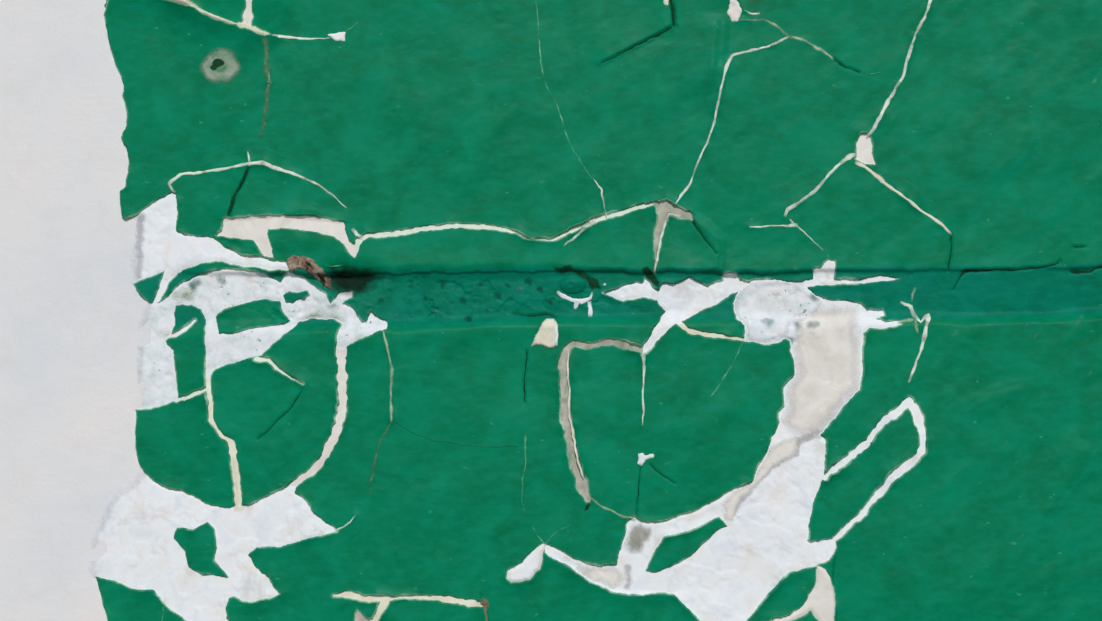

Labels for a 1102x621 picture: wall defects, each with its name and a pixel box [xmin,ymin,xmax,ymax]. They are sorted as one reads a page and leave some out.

peeling [169,0,356,41]
crack [167,0,1102,288]
peeling [132,193,398,439]
peeling [507,201,901,621]
peeling [92,468,354,621]